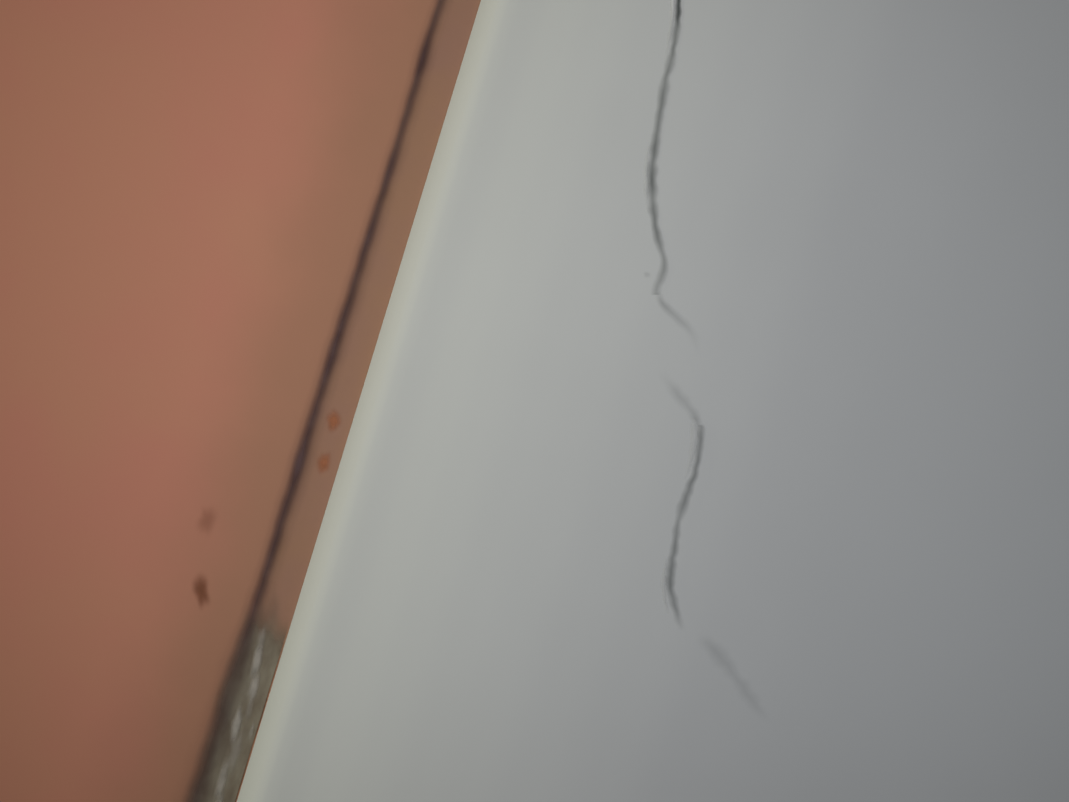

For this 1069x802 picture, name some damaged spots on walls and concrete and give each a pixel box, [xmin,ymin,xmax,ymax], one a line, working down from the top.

crack [671,0,680,26]